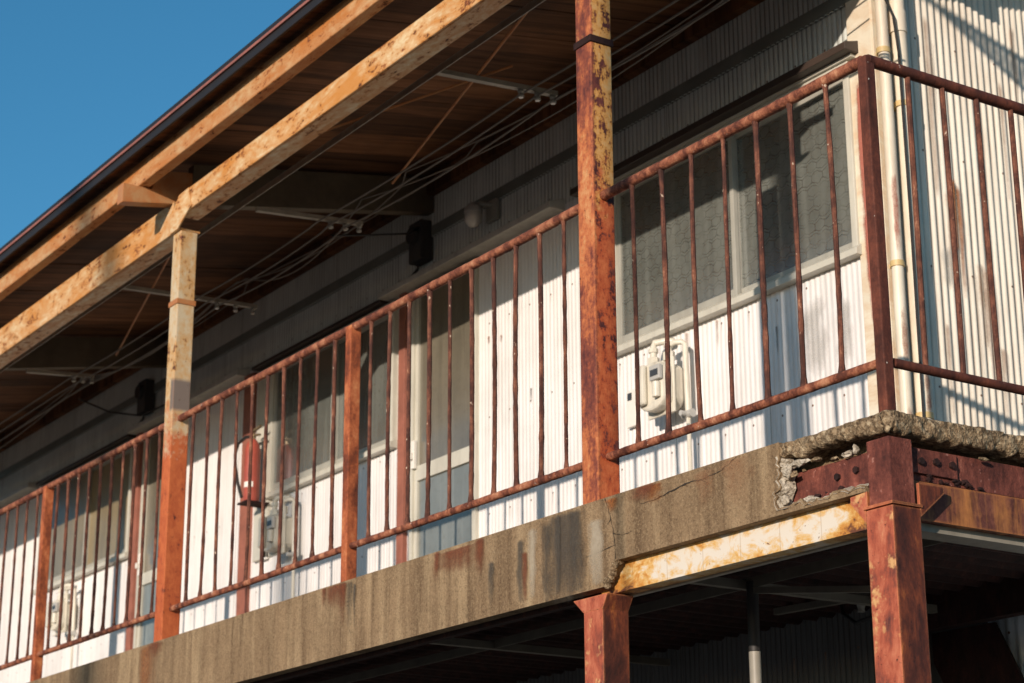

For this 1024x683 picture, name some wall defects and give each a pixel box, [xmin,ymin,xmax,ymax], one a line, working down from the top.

crack [641,457,736,504]
spalling [772,444,869,511]
spalling [926,474,984,491]
corrosion [435,539,483,569]